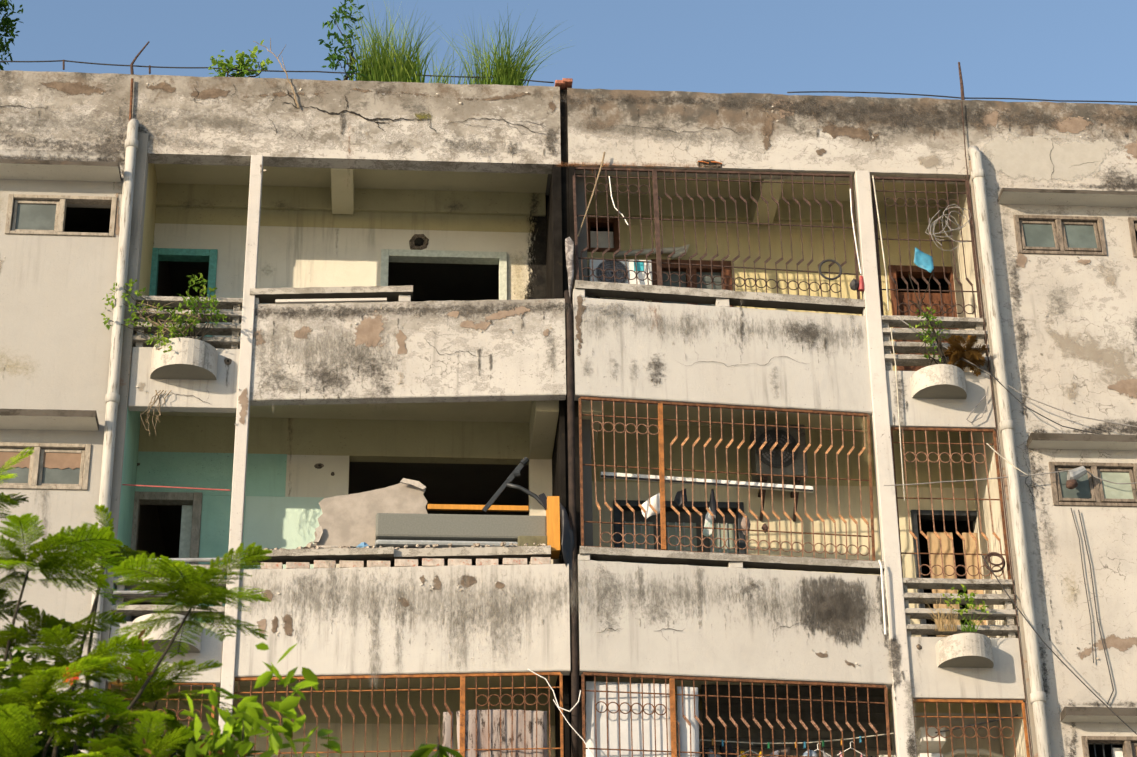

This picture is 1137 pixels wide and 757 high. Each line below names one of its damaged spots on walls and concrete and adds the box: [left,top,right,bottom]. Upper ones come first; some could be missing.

flaking render [38,81,106,98]
crack [230,83,555,142]
water stain [564,94,989,144]
water stain [254,302,625,400]
water stain [736,299,843,352]
peeling [1050,332,1137,404]
flaking render [419,575,442,592]
flaking render [457,574,477,592]
flaking render [257,614,294,636]
water stain [250,566,576,681]
water stain [742,576,918,757]
peeling [1077,634,1137,660]